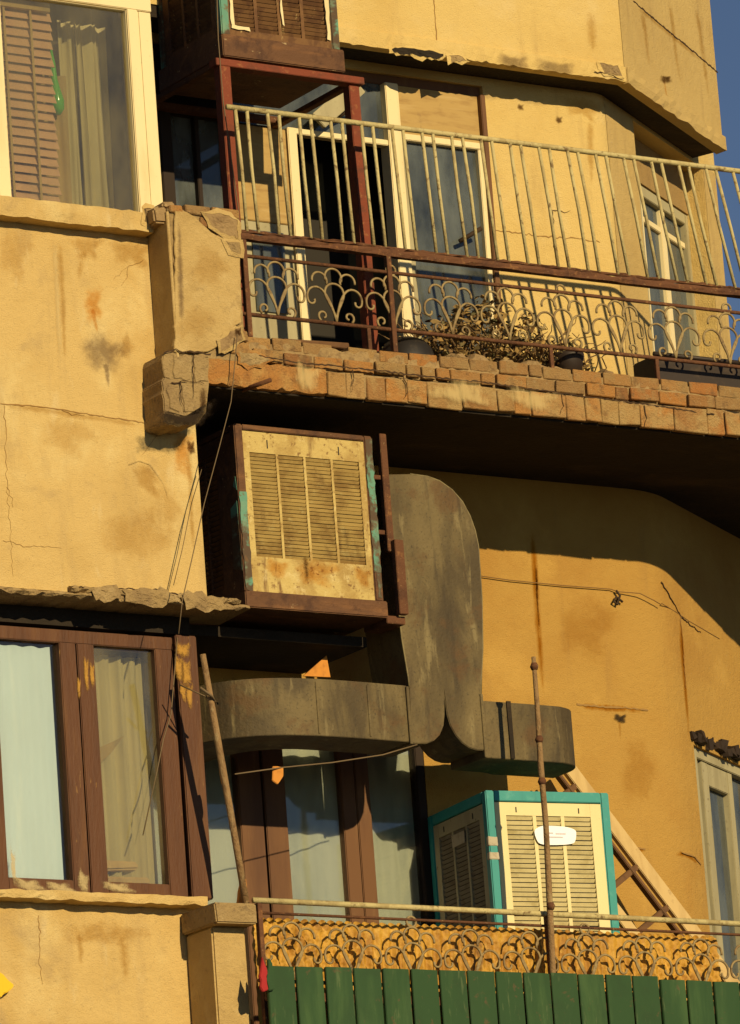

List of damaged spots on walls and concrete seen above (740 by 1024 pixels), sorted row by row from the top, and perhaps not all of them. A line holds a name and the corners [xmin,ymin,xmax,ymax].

flaking render [389,46,470,65]
flaking render [595,61,625,80]
flaking render [141,202,245,258]
crack [496,210,600,247]
crack [0,403,156,572]
flaking render [72,584,229,613]